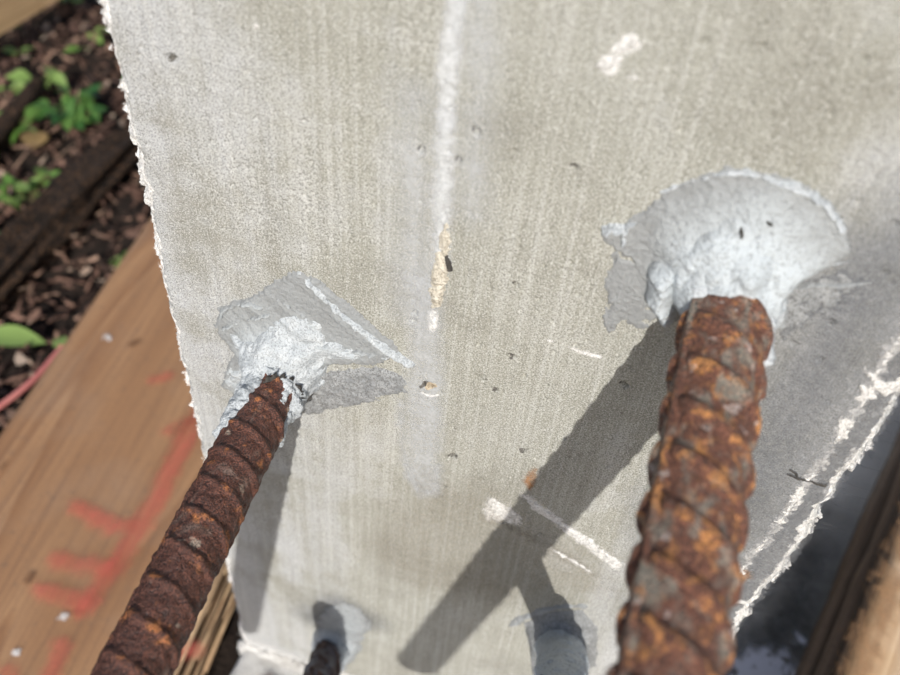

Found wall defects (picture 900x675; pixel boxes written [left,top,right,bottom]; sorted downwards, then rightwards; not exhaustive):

spalling [428,222,453,330]
spalling [90,0,341,675]
spalling [419,381,438,397]
spalling [524,294,900,675]
crack [786,469,828,487]